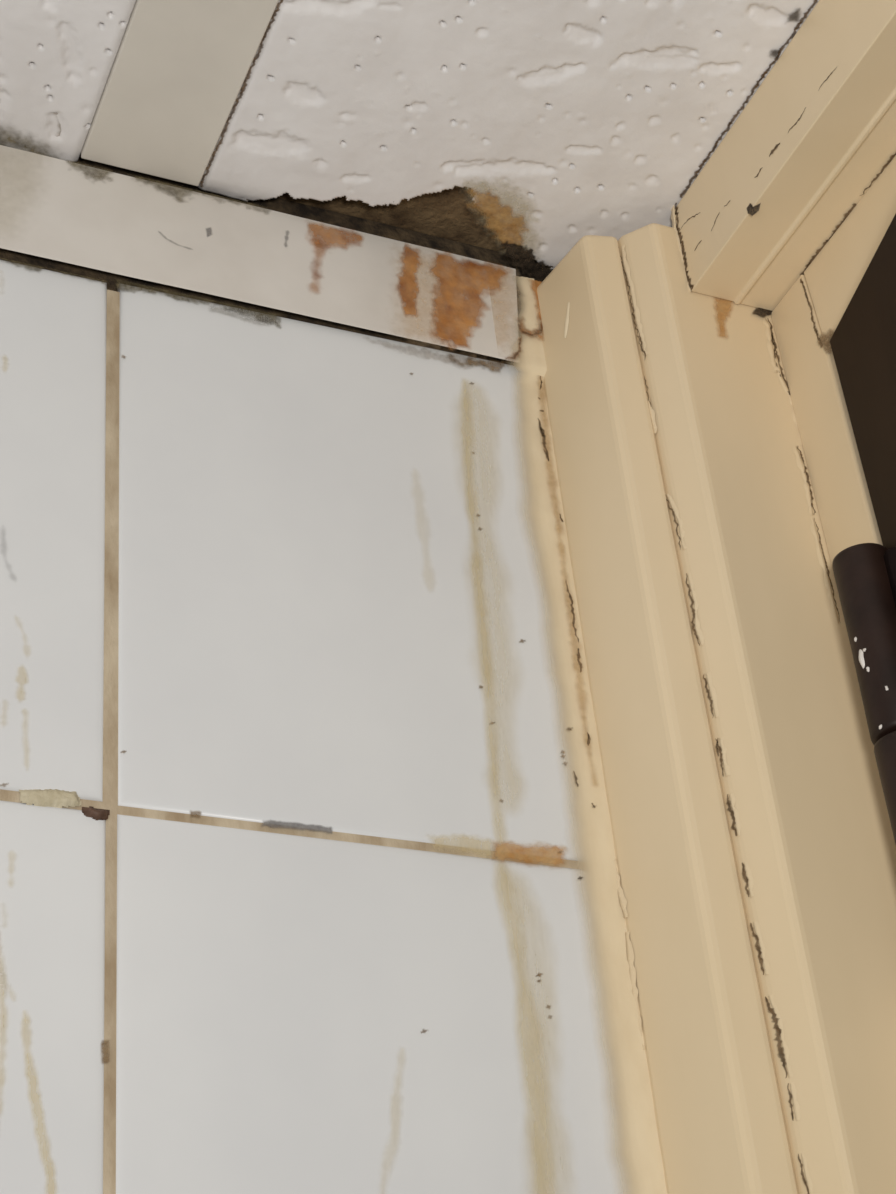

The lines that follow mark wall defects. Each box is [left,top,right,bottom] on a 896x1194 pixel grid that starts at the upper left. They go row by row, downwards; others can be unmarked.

mould [0,131,49,157]
crack [756,67,837,177]
rust [309,224,362,246]
spalling [278,186,507,252]
rust [398,245,419,315]
rust [432,254,506,346]
crack [671,201,730,292]
crack [538,376,549,461]
crack [763,319,840,624]
crack [566,583,582,672]
crack [666,494,801,1121]
rust [496,843,563,865]